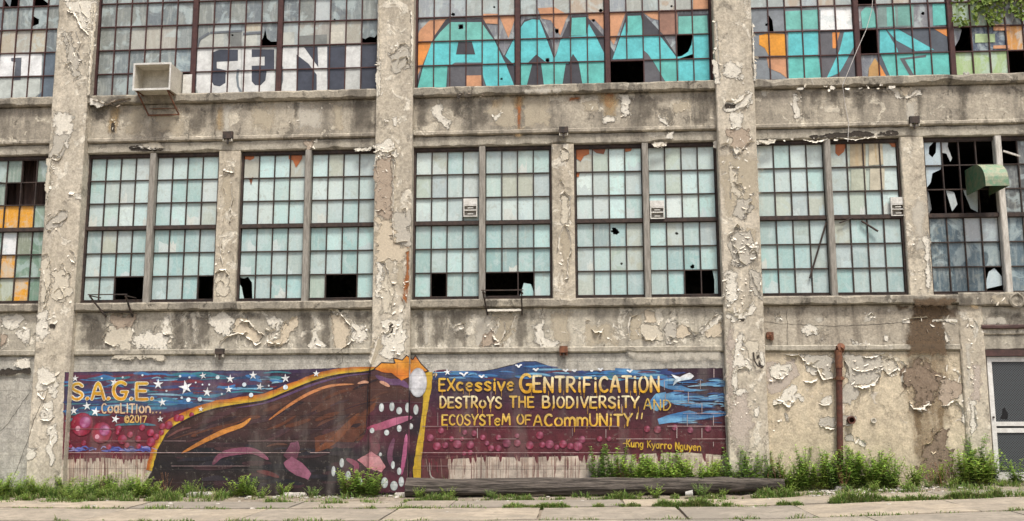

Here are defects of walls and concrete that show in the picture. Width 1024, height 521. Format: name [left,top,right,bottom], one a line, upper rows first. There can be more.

peeling [375,4,414,96]
peeling [44,111,76,232]
peeling [307,116,412,364]
peeling [582,20,983,454]
peeling [0,250,76,466]
peeling [102,313,175,361]
peeling [208,310,299,347]
peeling [453,313,517,348]
peeling [529,319,560,347]
water stain [896,297,957,356]